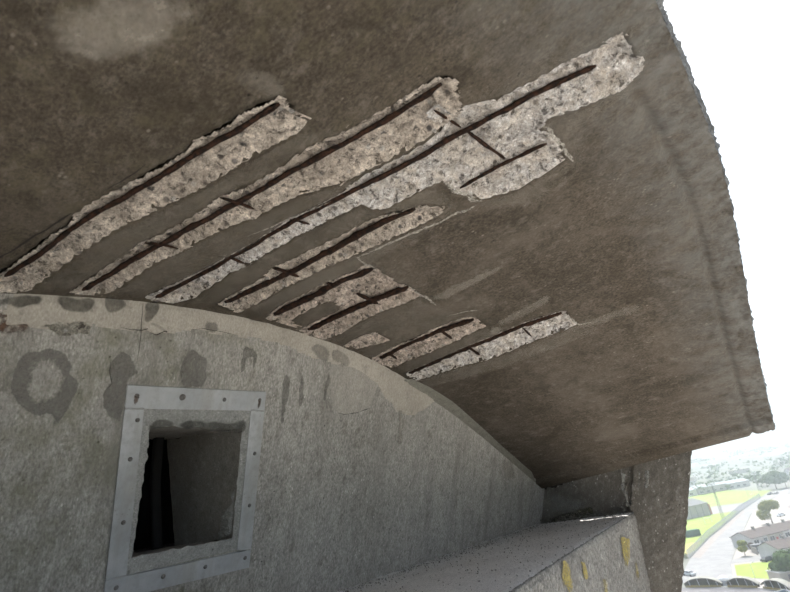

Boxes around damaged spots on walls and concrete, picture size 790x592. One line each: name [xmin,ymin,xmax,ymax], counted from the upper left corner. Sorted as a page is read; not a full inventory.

spalling [0,96,312,293]
spalling [69,32,645,313]
damp [4,296,41,307]
damp [58,297,94,311]
spalling [265,264,420,339]
spalling [344,311,577,380]
damp [11,349,78,422]
damp [103,352,137,419]